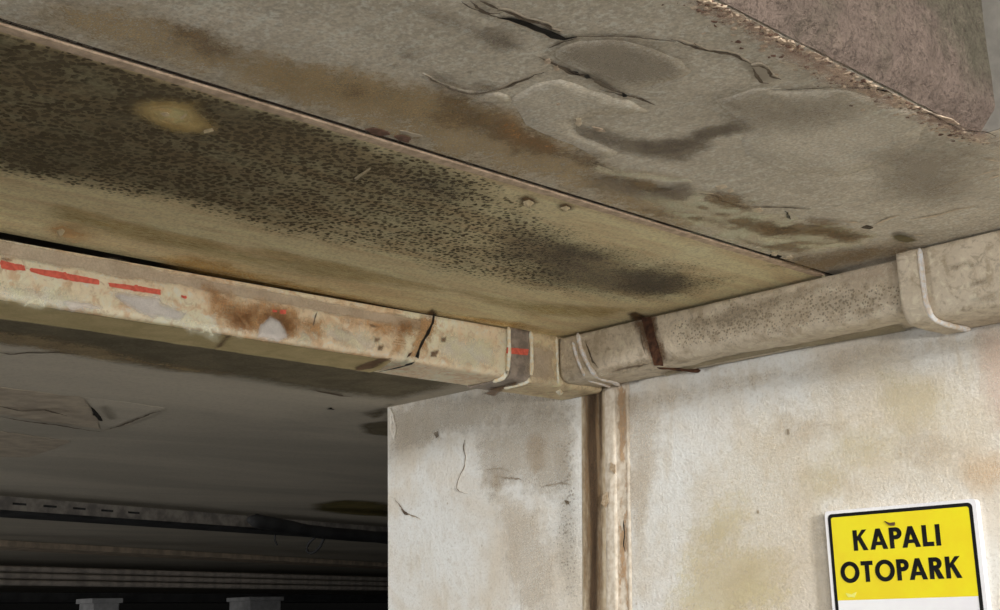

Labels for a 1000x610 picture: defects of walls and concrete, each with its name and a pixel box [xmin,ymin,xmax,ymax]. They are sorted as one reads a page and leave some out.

crack [422,1,752,105]
flaking render [677,0,991,145]
damp [0,5,917,301]
rust [203,285,322,347]
peeling [259,319,286,340]
crack [379,314,435,372]
rust [629,313,665,360]
damp [671,287,899,345]
crack [455,440,569,494]
crack [393,498,420,520]